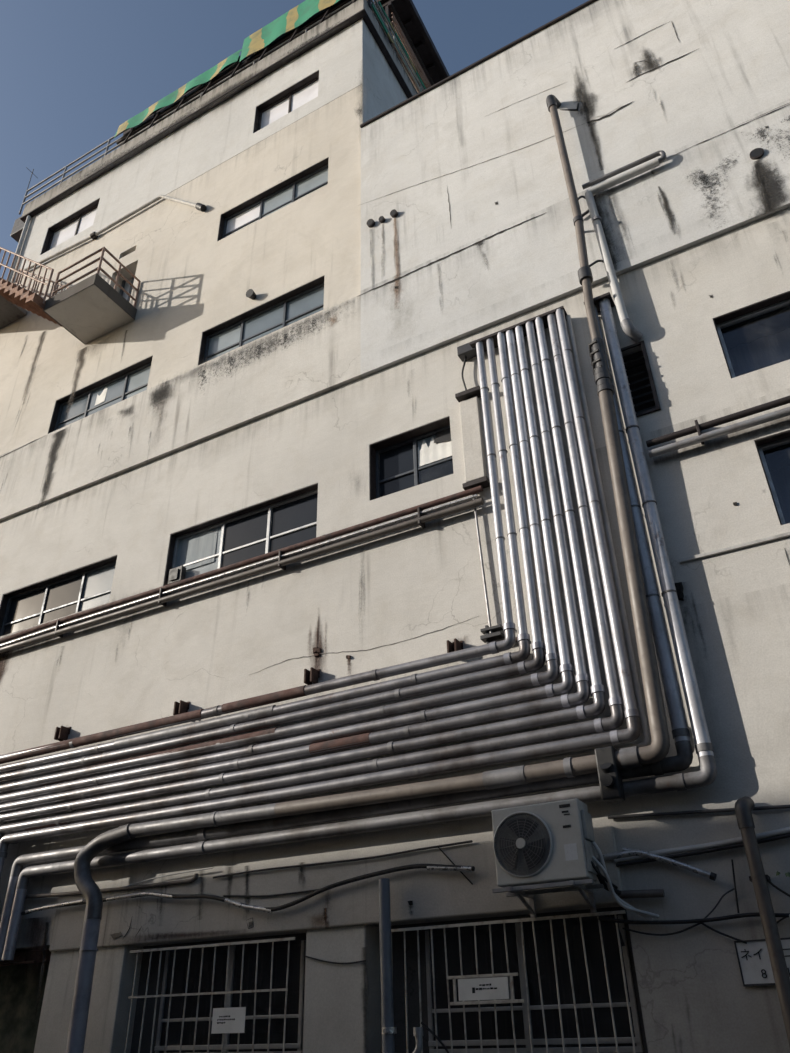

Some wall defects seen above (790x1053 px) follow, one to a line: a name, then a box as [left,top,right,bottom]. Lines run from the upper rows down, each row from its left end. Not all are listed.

water stain [634,51,658,76]
water stain [575,79,602,167]
water stain [658,186,673,229]
water stain [687,160,736,217]
water stain [753,159,786,216]
water stain [220,318,325,373]
water stain [152,385,169,404]
water stain [42,429,66,502]